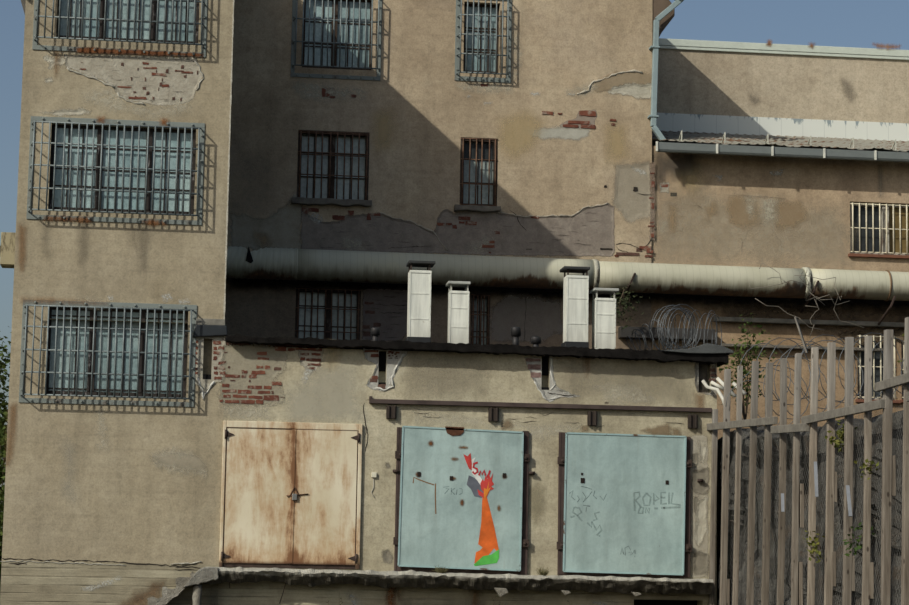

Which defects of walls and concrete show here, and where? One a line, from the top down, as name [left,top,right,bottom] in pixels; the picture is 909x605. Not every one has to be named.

spalling [43,55,204,106]
flaking render [577,69,652,99]
spalling [223,0,234,319]
flaking render [532,110,597,140]
spalling [301,162,677,257]
spalling [195,336,324,405]
spalling [362,288,408,391]
spalling [525,357,578,402]